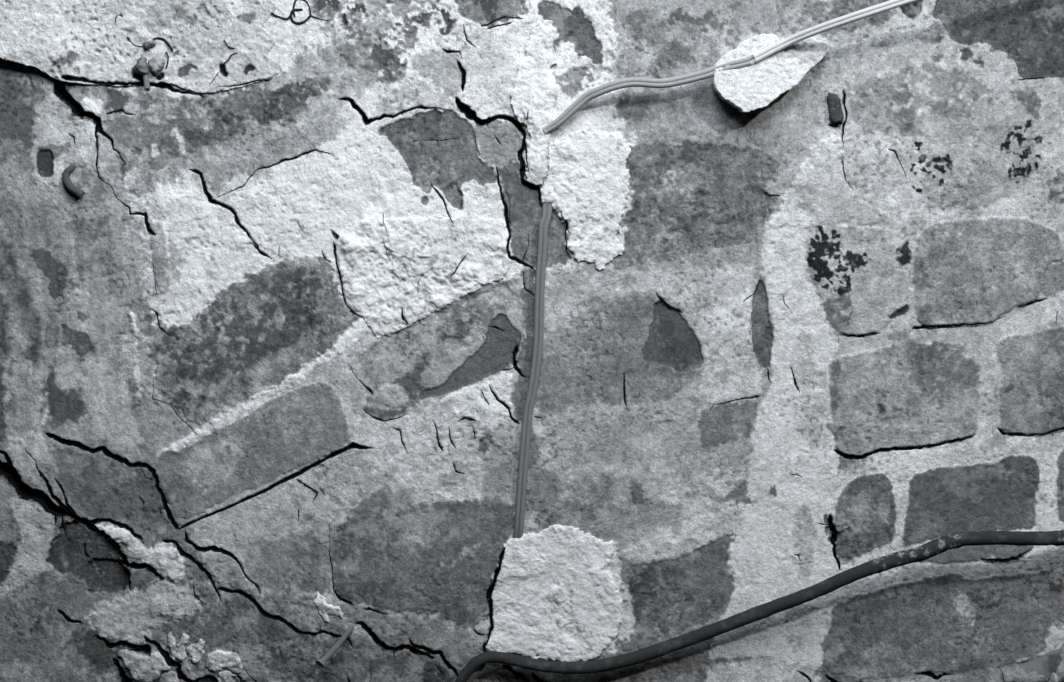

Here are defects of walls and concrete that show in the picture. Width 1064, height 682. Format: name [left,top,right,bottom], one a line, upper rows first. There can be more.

flaking render [132,40,165,81]
crack [53,75,273,235]
crack [190,149,335,259]
crack [338,16,572,295]
crack [152,262,171,336]
crack [322,228,360,317]
crack [349,364,408,453]
crack [433,326,542,474]
spalling [46,518,131,593]
crack [0,433,458,682]
flaking render [117,631,243,682]
crack [473,547,543,682]